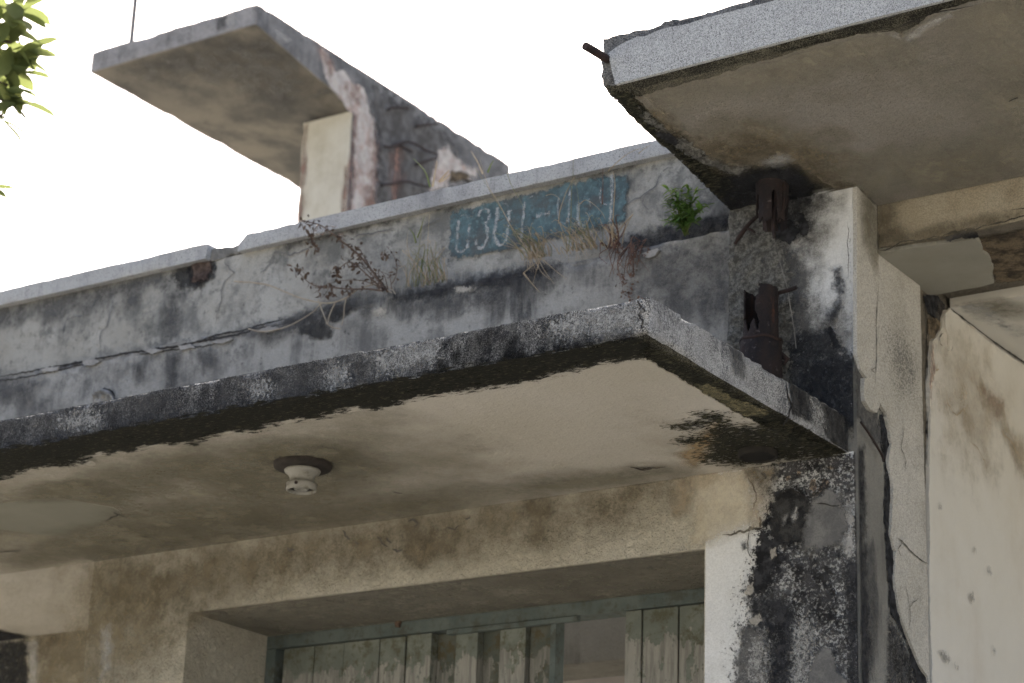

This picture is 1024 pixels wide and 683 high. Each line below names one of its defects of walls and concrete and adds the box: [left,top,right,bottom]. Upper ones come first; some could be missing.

spalling [320,47,479,210]
crack [0,254,284,400]
spalling [172,261,217,290]
water stain [622,110,852,325]
spalling [943,229,1024,283]
water stain [0,262,927,683]